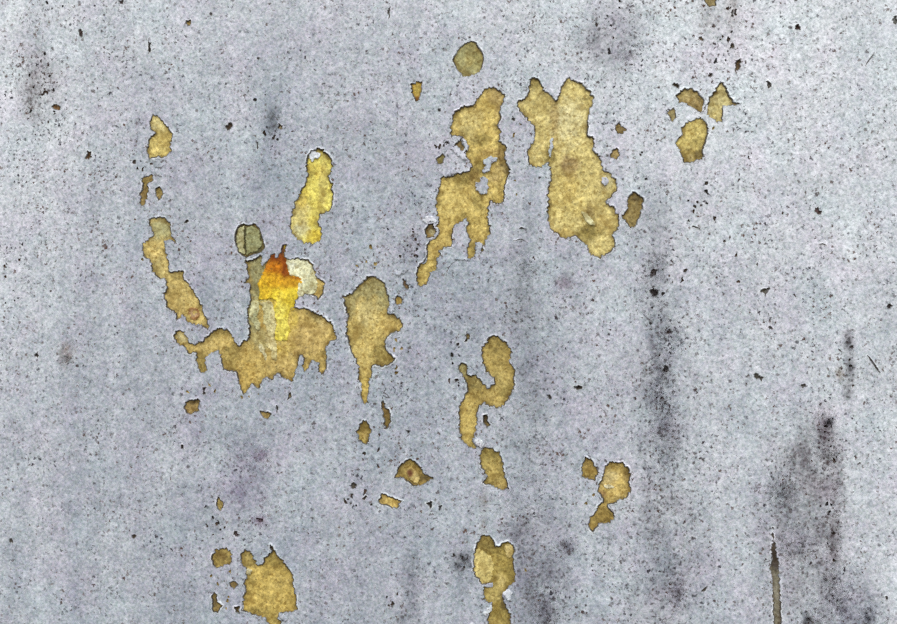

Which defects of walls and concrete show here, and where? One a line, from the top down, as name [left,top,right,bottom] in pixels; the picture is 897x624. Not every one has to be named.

peeling [451,40,486,77]
peeling [132,113,174,206]
peeling [141,76,647,456]
peeling [448,333,517,493]
peeling [204,496,300,624]
peeling [393,457,434,488]
peeling [452,533,527,624]
peeling [580,455,633,534]
crack [769,525,783,624]
leakage [751,403,888,624]